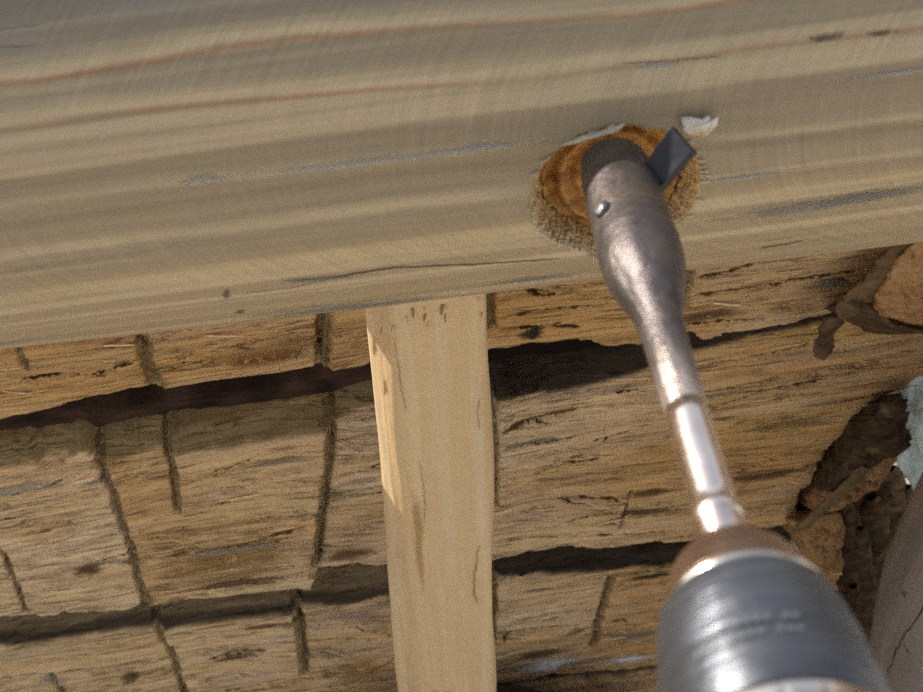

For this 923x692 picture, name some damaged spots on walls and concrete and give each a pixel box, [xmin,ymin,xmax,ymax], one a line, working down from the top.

crack [885,607,923,678]